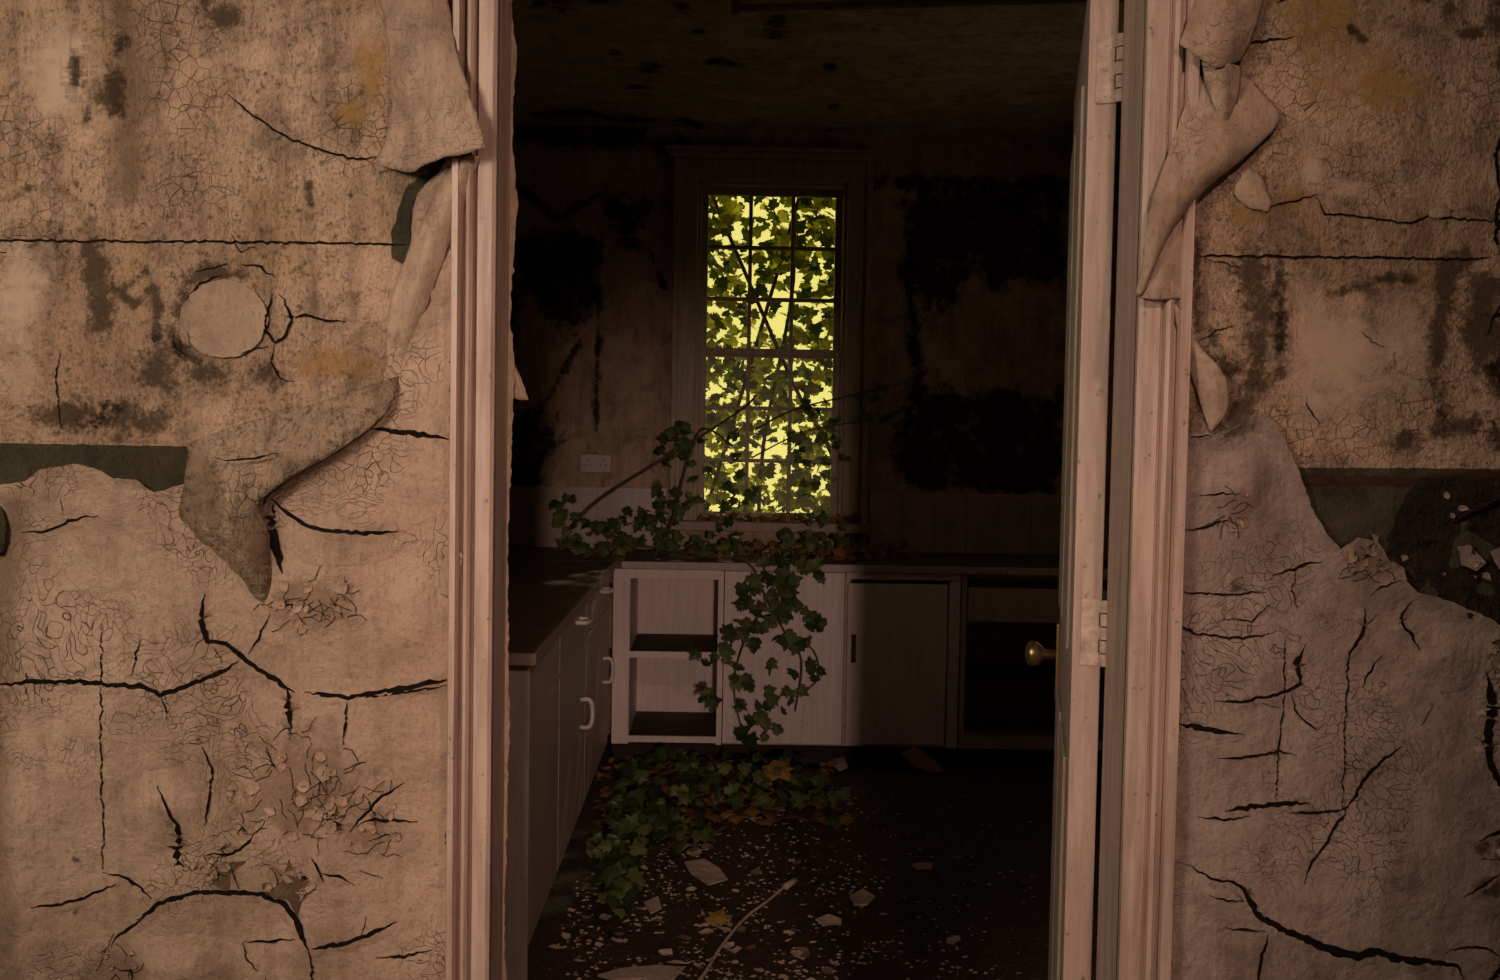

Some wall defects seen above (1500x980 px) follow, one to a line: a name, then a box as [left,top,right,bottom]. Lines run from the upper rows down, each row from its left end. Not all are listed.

water stain [29,32,129,123]
water stain [28,236,249,442]
crack [0,234,405,382]
mould [510,181,668,486]
mould [873,172,1070,495]
water stain [1194,237,1500,451]
crack [0,593,447,980]
peeling [0,244,451,980]
crack [263,499,399,576]
crack [1179,561,1434,884]
peeling [1171,411,1500,980]
crack [1173,846,1500,980]